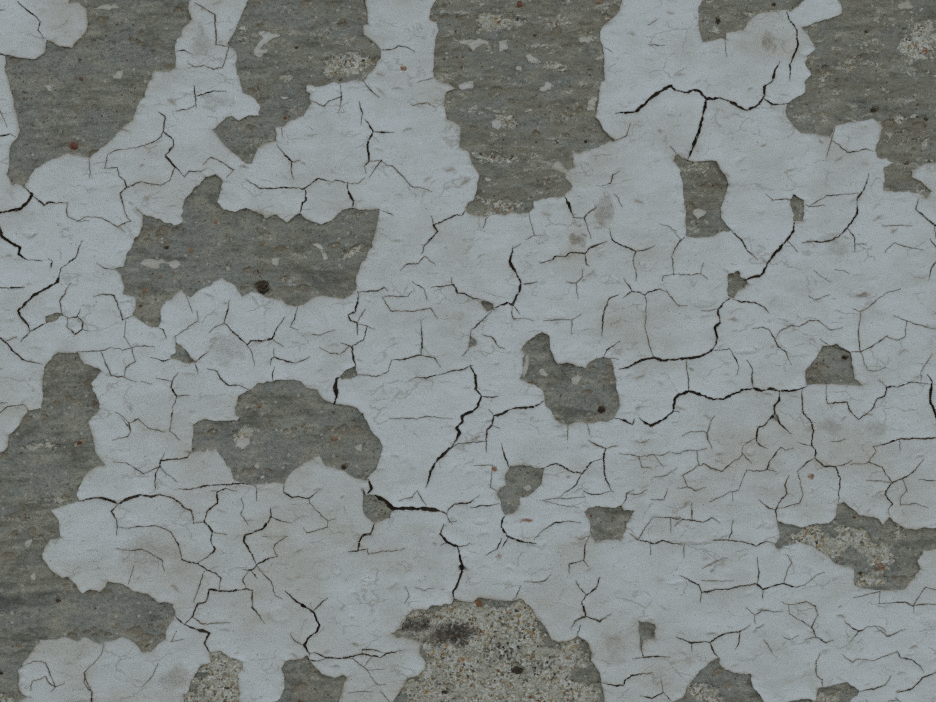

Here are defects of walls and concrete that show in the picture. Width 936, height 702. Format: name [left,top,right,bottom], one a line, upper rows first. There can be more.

peeling [5,0,192,186]
crack [179,3,230,70]
peeling [116,174,379,327]
peeling [214,0,381,164]
peeling [429,0,622,217]
crack [612,13,799,161]
crack [730,173,869,281]
crack [827,128,874,155]
peeling [786,0,936,197]
peeling [0,352,175,702]
crack [0,81,432,702]
crack [210,188,936,702]